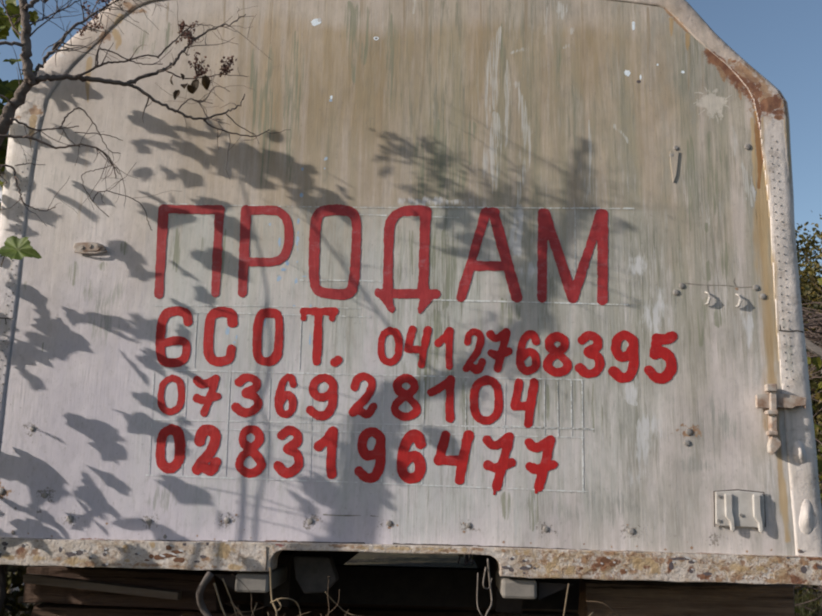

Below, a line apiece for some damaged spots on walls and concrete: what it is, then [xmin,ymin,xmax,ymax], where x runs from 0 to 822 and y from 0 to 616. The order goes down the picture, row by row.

damp [252,0,279,193]
damp [368,0,557,286]
corrosion [702,46,792,394]
corrosion [758,408,793,545]
peeling [59,547,92,560]
peeling [135,543,206,563]
peeling [501,556,536,574]
peeling [579,557,616,571]
peeling [669,556,696,573]